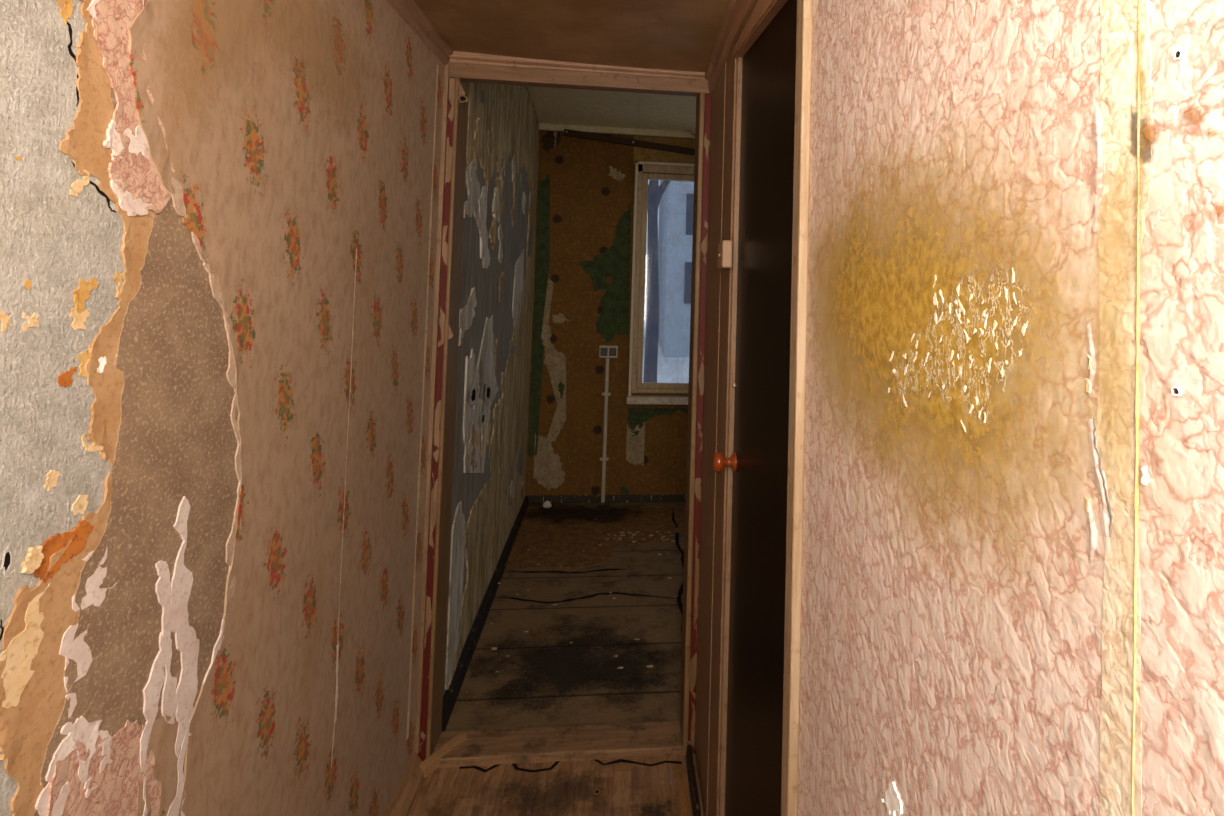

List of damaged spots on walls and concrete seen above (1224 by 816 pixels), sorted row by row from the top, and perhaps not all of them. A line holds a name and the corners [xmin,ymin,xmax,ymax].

peeling [437,78,570,690]
peeling [578,204,631,343]
leakage [816,203,1047,474]
flaking render [0,545,12,577]